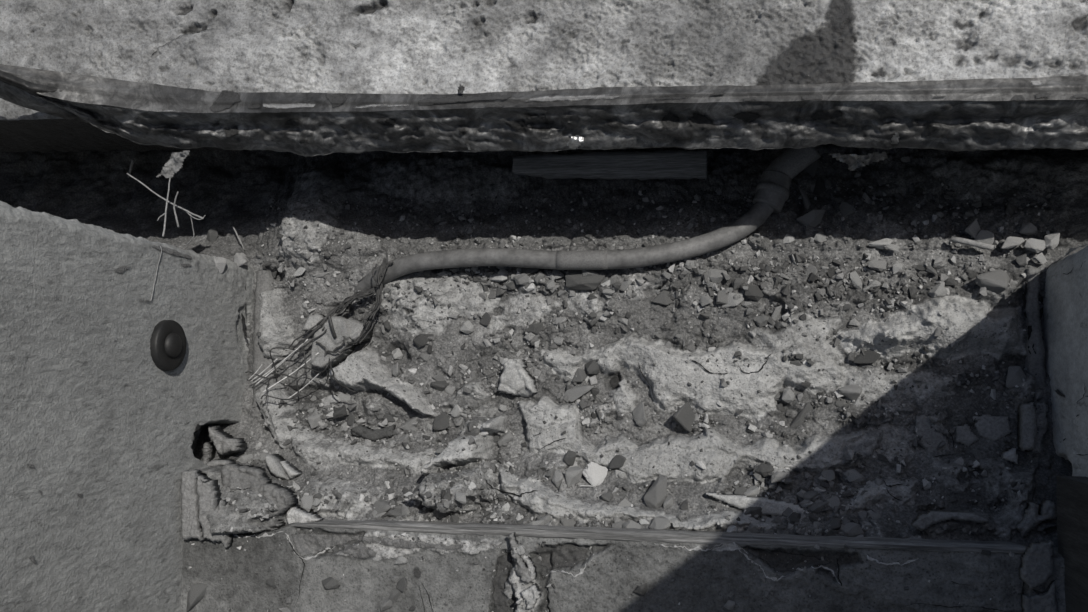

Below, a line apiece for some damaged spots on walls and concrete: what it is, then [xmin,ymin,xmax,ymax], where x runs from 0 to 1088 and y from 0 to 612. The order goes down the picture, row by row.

spalling [194,424,247,455]
spalling [1001,448,1018,464]
peeling [181,469,463,561]